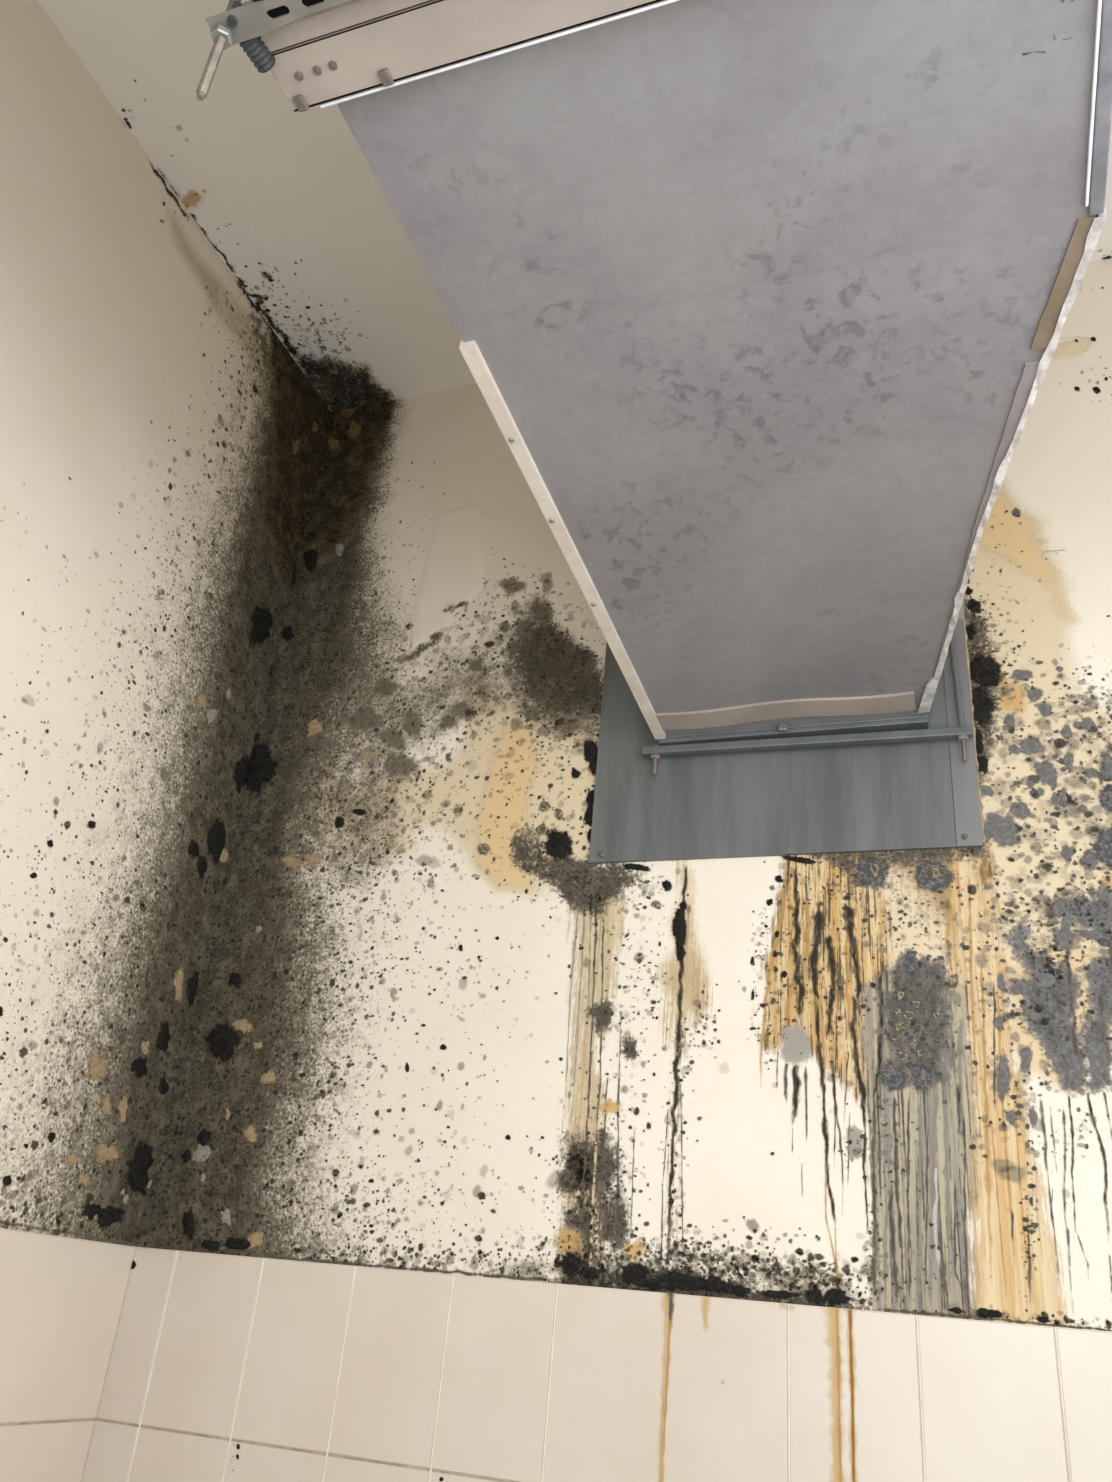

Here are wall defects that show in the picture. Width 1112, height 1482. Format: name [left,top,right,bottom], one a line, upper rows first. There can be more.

damp [0,163,1112,1331]
corrosion [659,1292,674,1482]
corrosion [828,1307,856,1482]